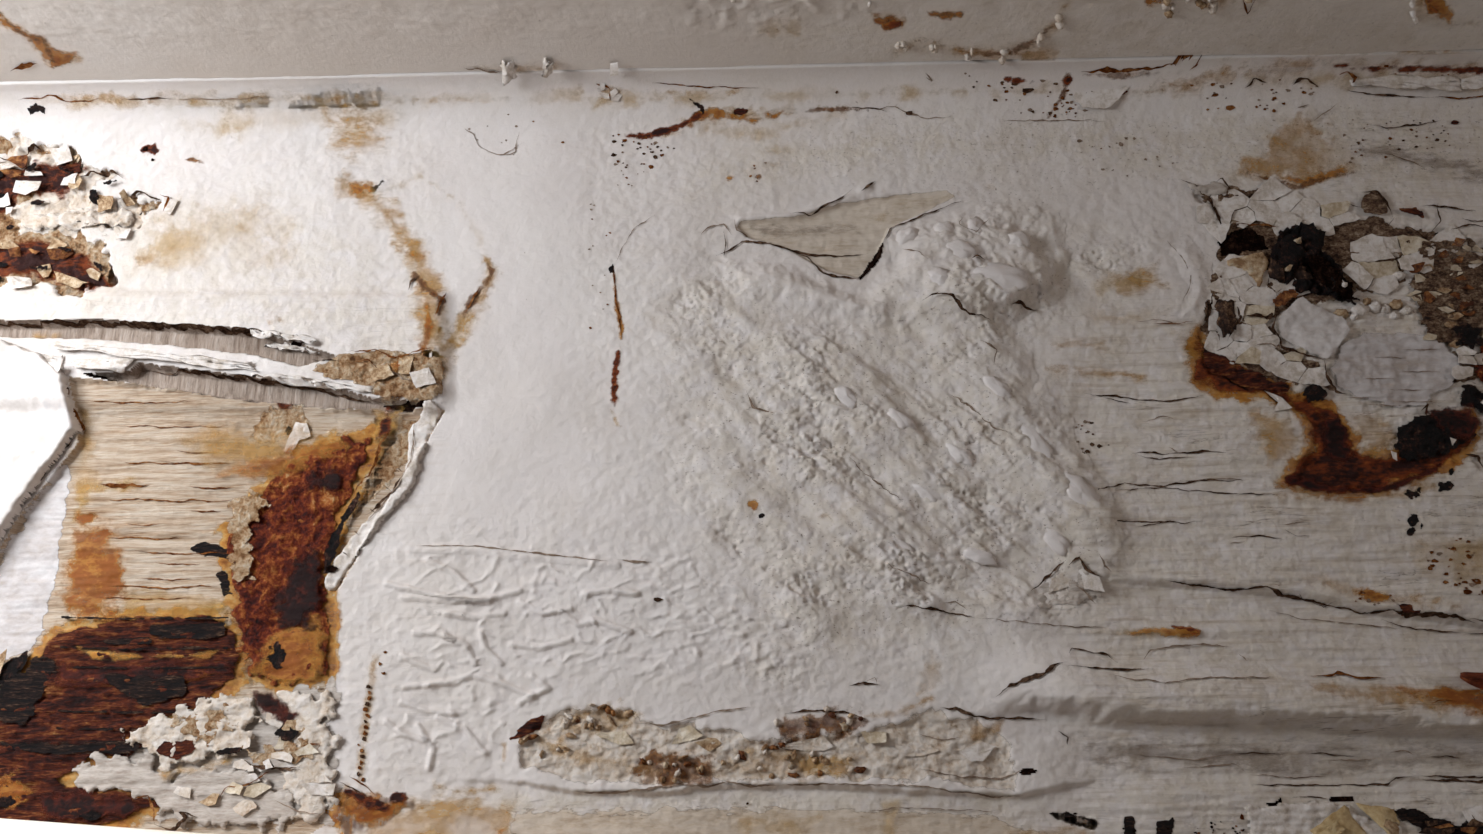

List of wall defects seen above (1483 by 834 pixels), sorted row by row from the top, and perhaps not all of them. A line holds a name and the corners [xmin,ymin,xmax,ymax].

spalling [0,132,178,298]
rust [611,83,782,186]
damp [1243,119,1459,189]
crack [1086,393,1306,543]
rust [1185,326,1483,502]
spalling [0,339,445,834]
rust [204,403,399,693]
crack [894,601,1269,696]
crack [1171,581,1483,634]
rust [325,651,407,834]
spalling [509,703,1044,798]
peeling [1194,799,1483,834]